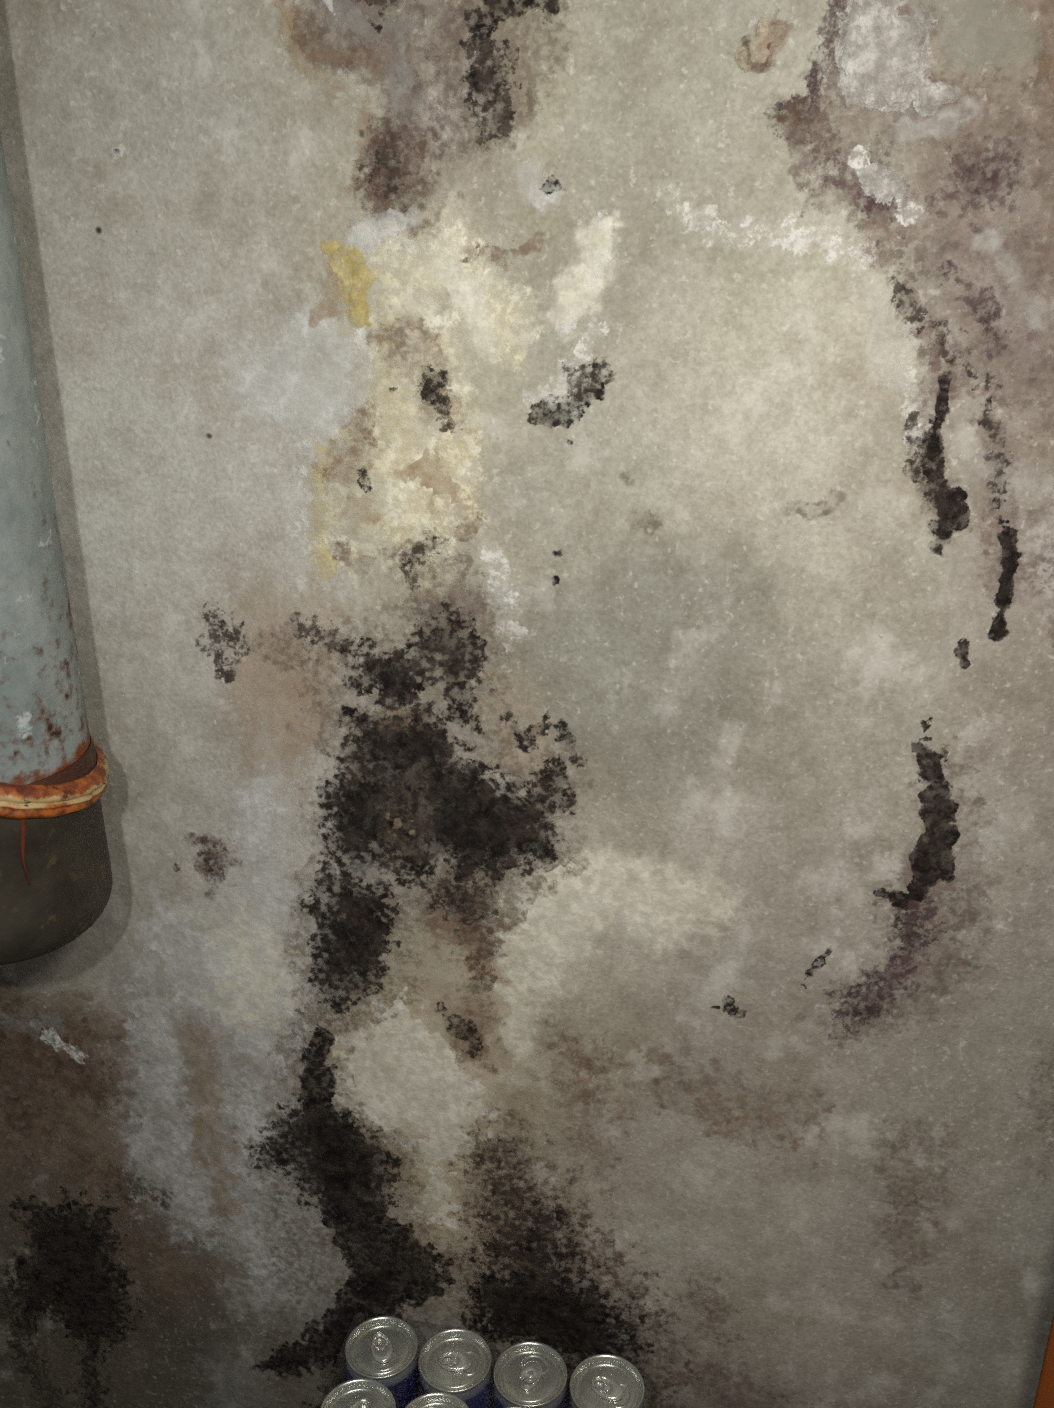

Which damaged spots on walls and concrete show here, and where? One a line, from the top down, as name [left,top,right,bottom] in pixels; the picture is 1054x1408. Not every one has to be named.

leakage [667,0,1054,641]
leakage [0,0,799,1408]
leakage [801,717,991,1039]
leakage [954,638,971,669]